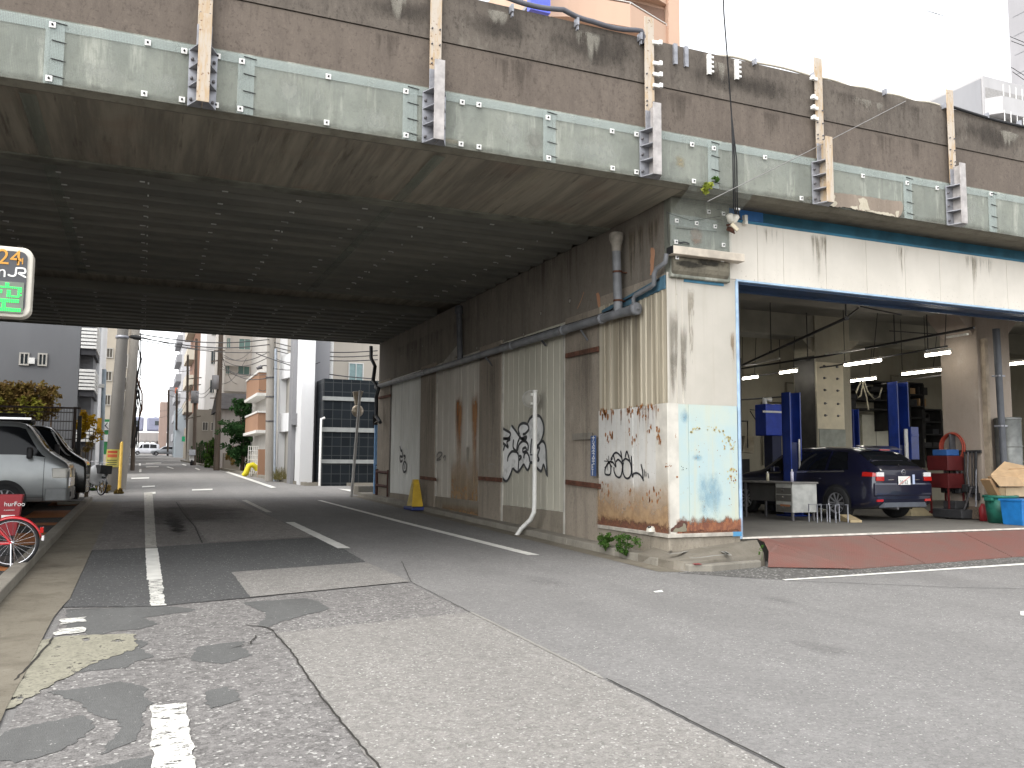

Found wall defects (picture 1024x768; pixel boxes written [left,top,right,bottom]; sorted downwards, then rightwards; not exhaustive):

corrosion [600,404,661,445]